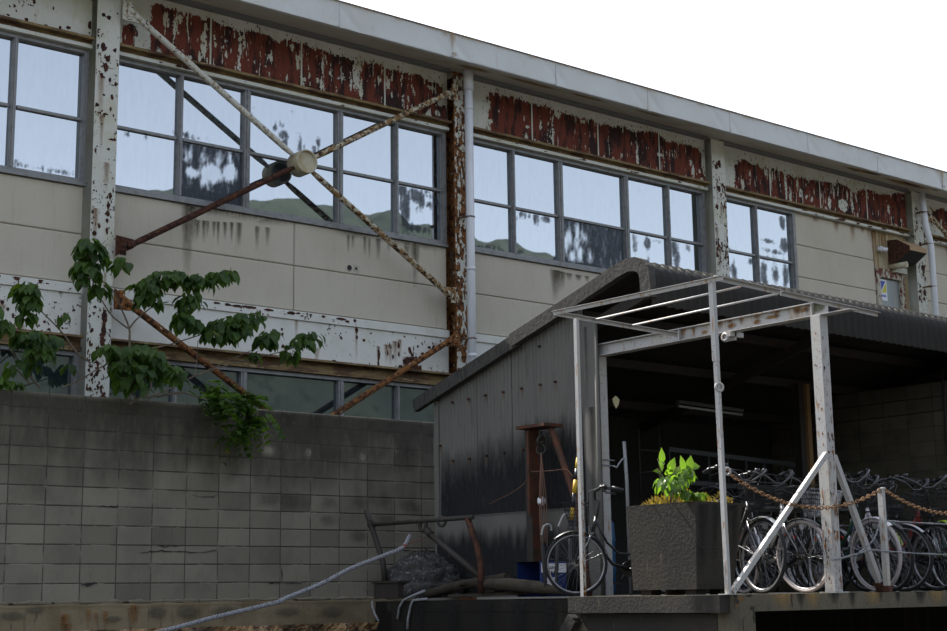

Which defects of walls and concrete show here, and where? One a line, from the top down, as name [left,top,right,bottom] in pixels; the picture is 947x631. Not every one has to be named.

rust [88,3,447,167]
rust [0,178,115,398]
rust [214,302,441,372]